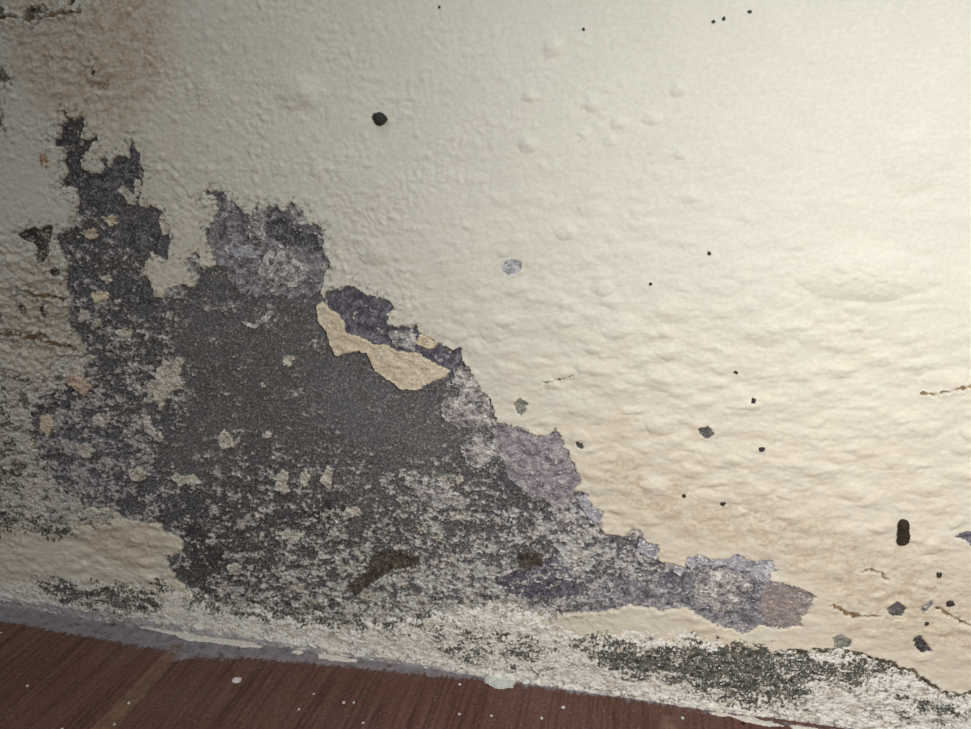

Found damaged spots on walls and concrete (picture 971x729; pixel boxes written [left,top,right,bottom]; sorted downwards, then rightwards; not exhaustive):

peeling [0,112,815,634]
damp [0,405,76,542]
peeling [955,531,971,545]
flaking render [0,579,971,729]
damp [31,571,969,729]